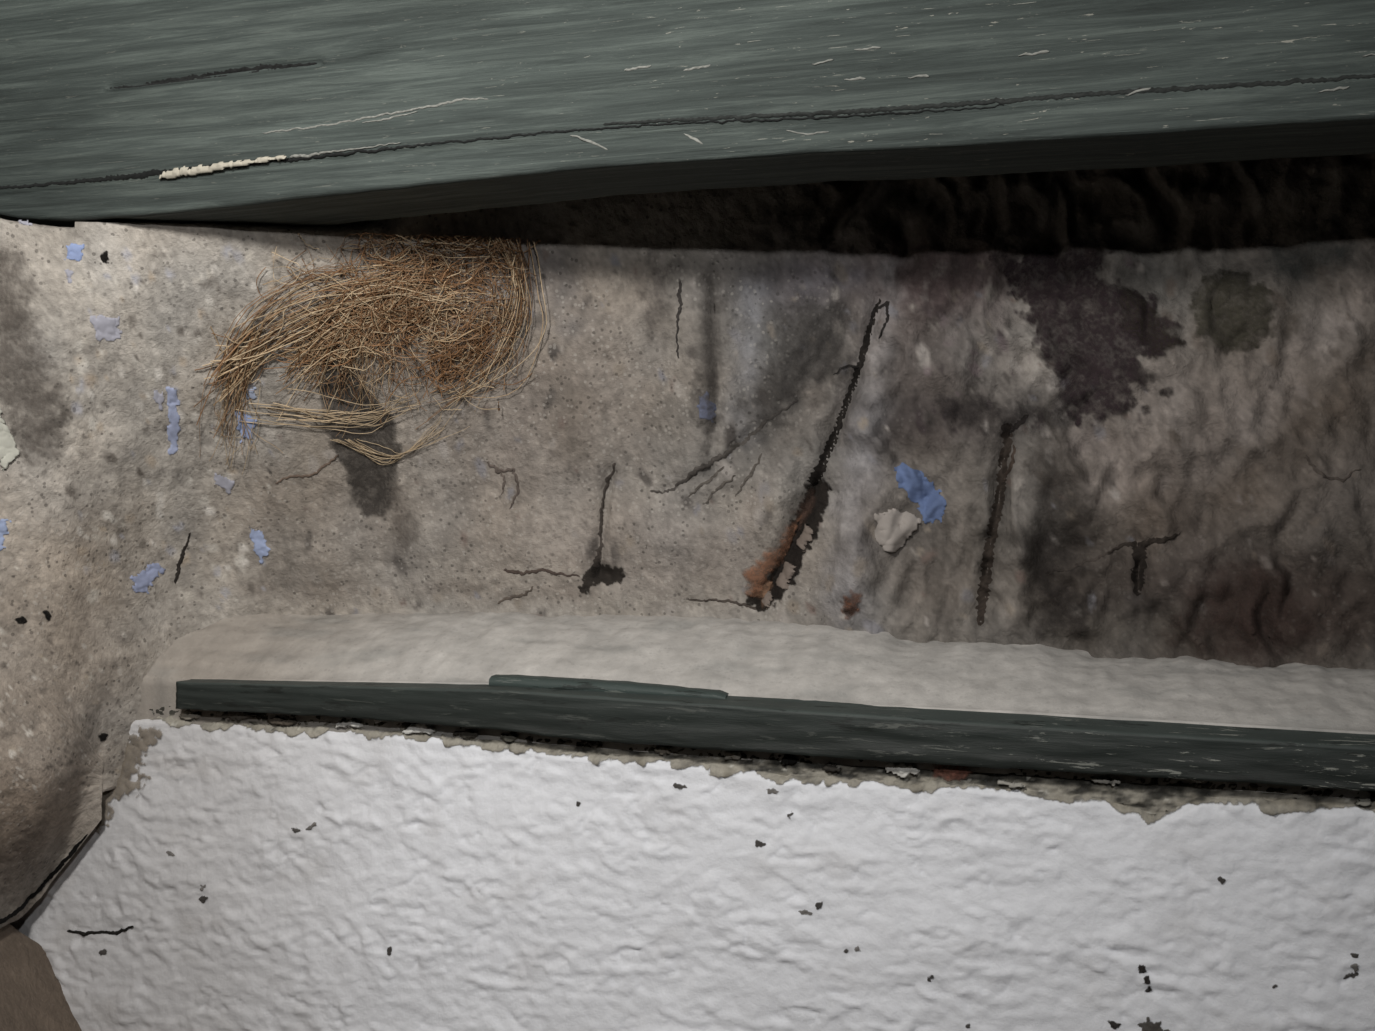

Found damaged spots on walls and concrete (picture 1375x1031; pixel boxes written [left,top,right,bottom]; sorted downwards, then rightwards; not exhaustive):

crack [806,298,890,484]
damp [896,240,1272,431]
crack [498,463,625,604]
corrosion [743,491,816,597]
crack [975,415,1026,626]
spalling [95,706,1375,833]
crack [0,834,88,924]